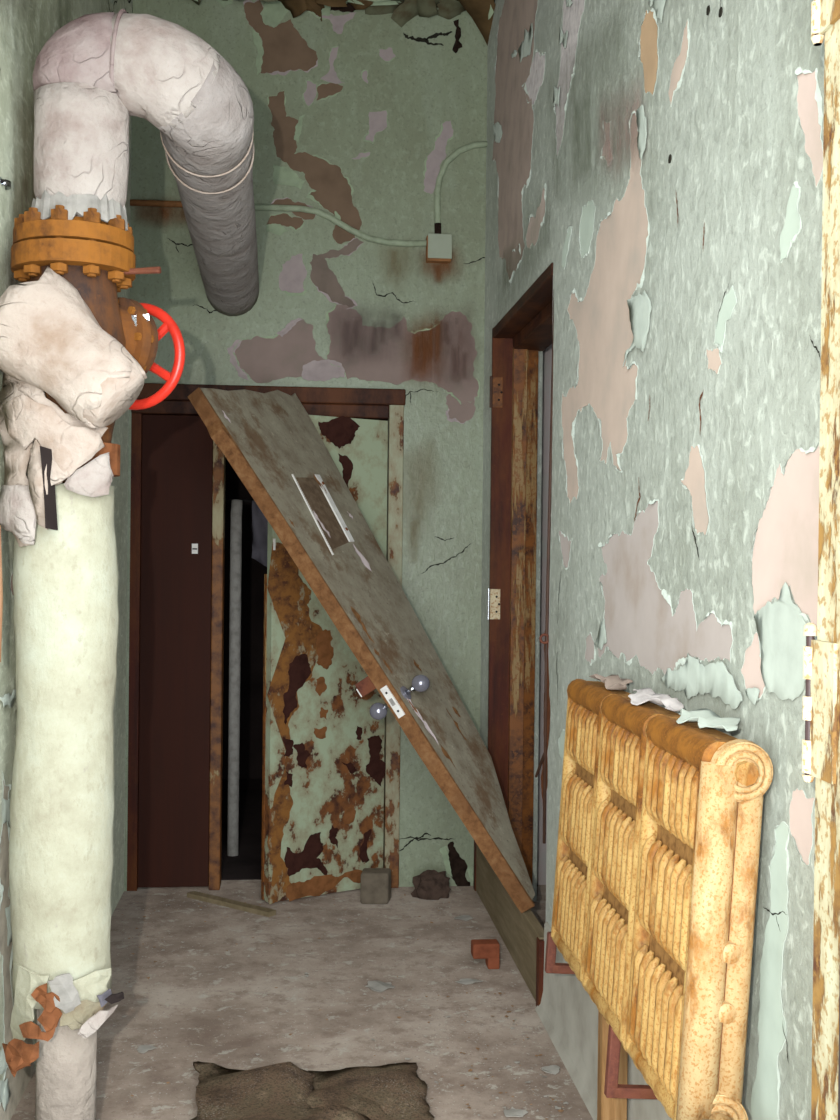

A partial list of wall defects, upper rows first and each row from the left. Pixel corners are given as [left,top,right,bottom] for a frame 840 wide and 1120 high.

crack [426,31,452,39]
peeling [795,67,823,188]
peeling [216,0,585,424]
peeling [561,0,690,503]
peeling [705,285,737,375]
peeling [780,181,802,263]
crack [423,536,470,573]
peeling [585,441,820,712]
peeling [541,635,566,800]
peeling [751,788,815,1120]